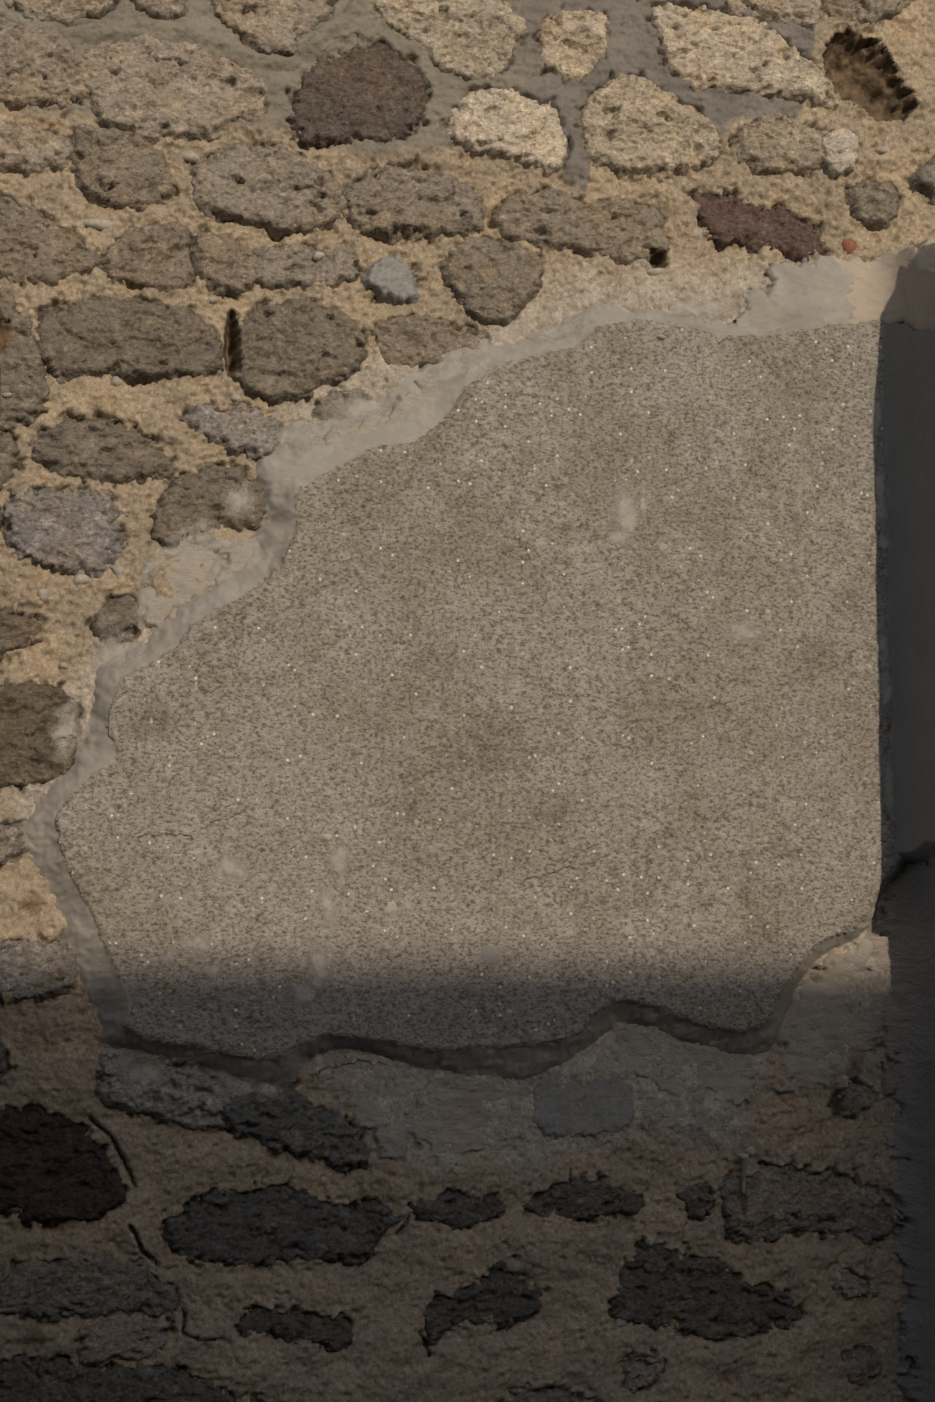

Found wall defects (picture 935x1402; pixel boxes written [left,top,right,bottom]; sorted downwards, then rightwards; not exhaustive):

hole [822,28,918,122]